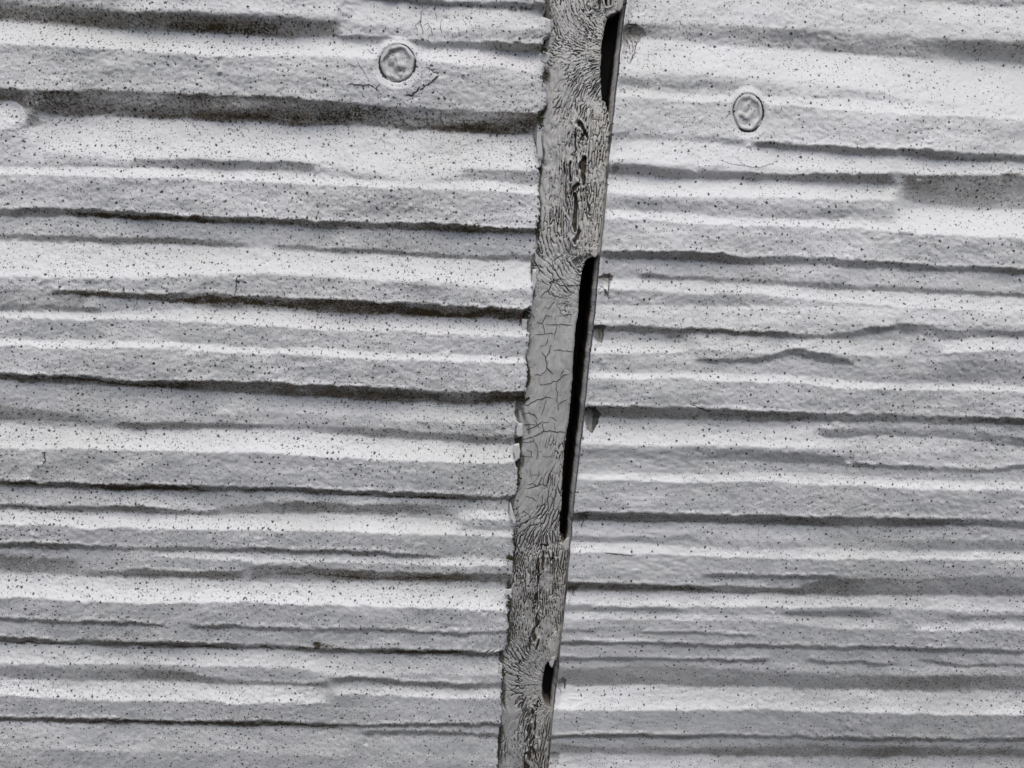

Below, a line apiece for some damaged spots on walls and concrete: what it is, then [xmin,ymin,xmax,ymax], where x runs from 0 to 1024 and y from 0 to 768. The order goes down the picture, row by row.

crack [500,0,616,768]